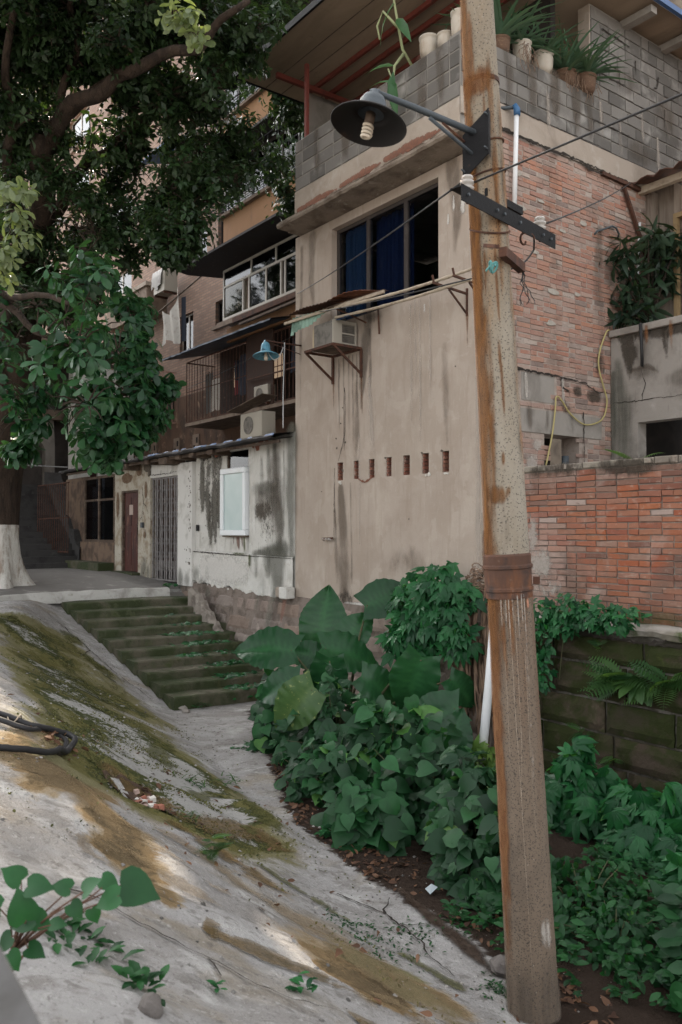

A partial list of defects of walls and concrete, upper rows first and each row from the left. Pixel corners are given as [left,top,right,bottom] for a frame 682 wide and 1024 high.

rust [459,0,501,127]
rust [466,205,514,565]
crack [517,366,682,462]
leakage [199,455,222,545]
leakage [255,500,277,536]
rust [488,599,514,936]
crack [337,893,454,976]